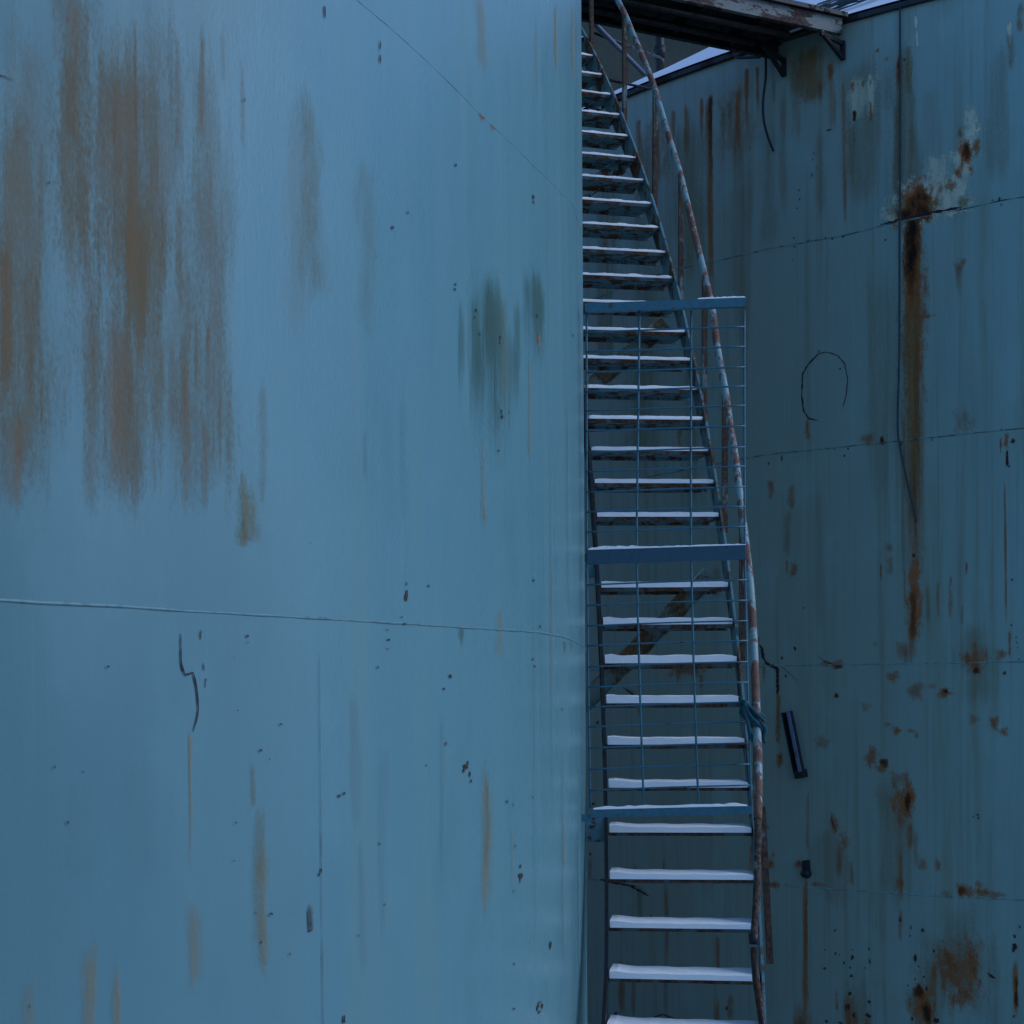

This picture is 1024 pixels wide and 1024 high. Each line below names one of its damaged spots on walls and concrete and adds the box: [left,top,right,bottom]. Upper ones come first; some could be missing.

corrosion [684,67,759,275]
peeling [879,104,982,228]
corrosion [900,218,927,508]
crack [180,630,207,732]
corrosion [902,553,922,657]
corrosion [963,633,1011,673]
corrosion [867,750,888,772]
corrosion [889,779,915,846]
corrosion [909,943,995,1024]